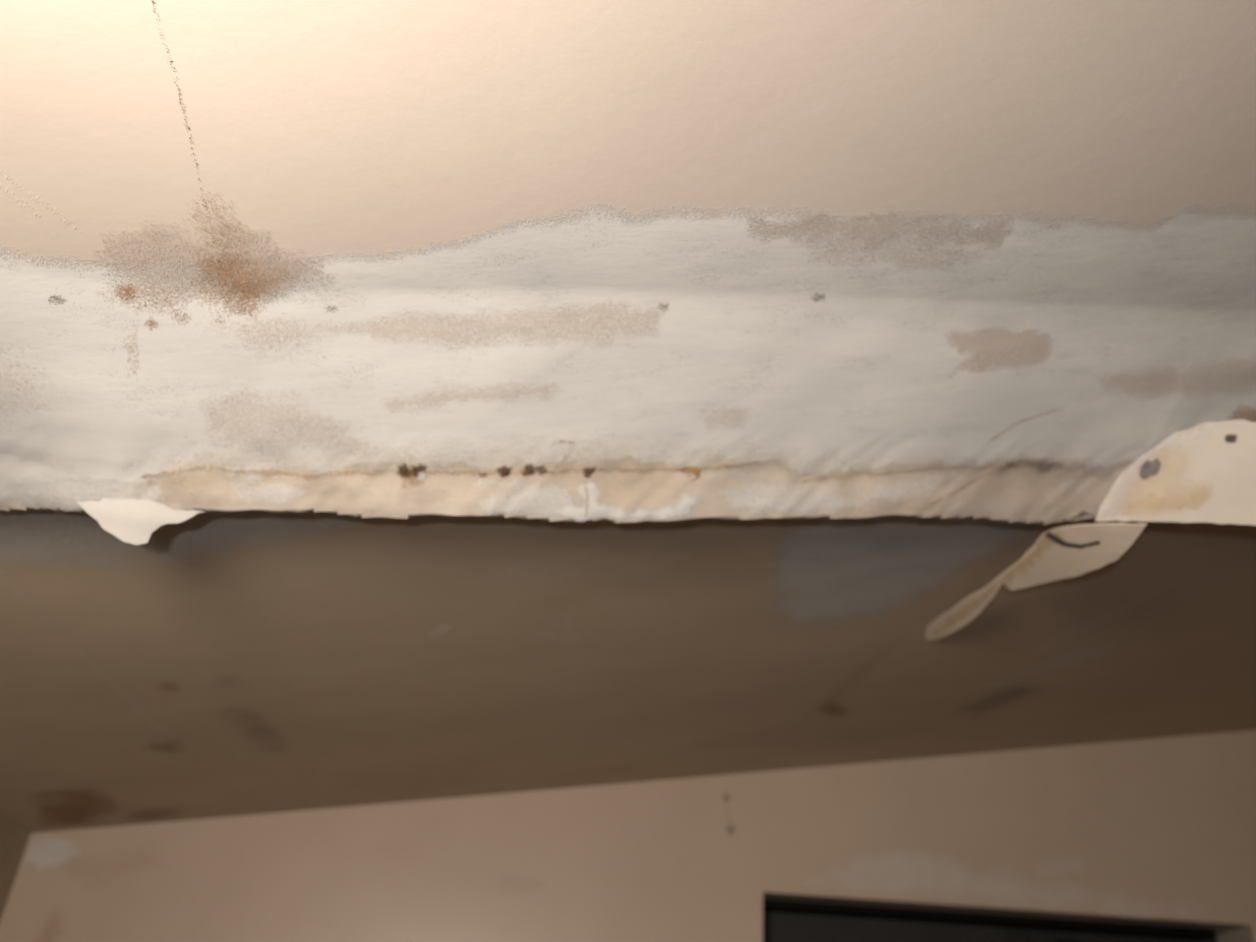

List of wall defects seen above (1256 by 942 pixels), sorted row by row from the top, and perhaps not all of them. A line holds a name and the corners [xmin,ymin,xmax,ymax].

water stain [87,191,671,375]
peeling [0,454,1136,545]
water stain [107,379,1214,637]